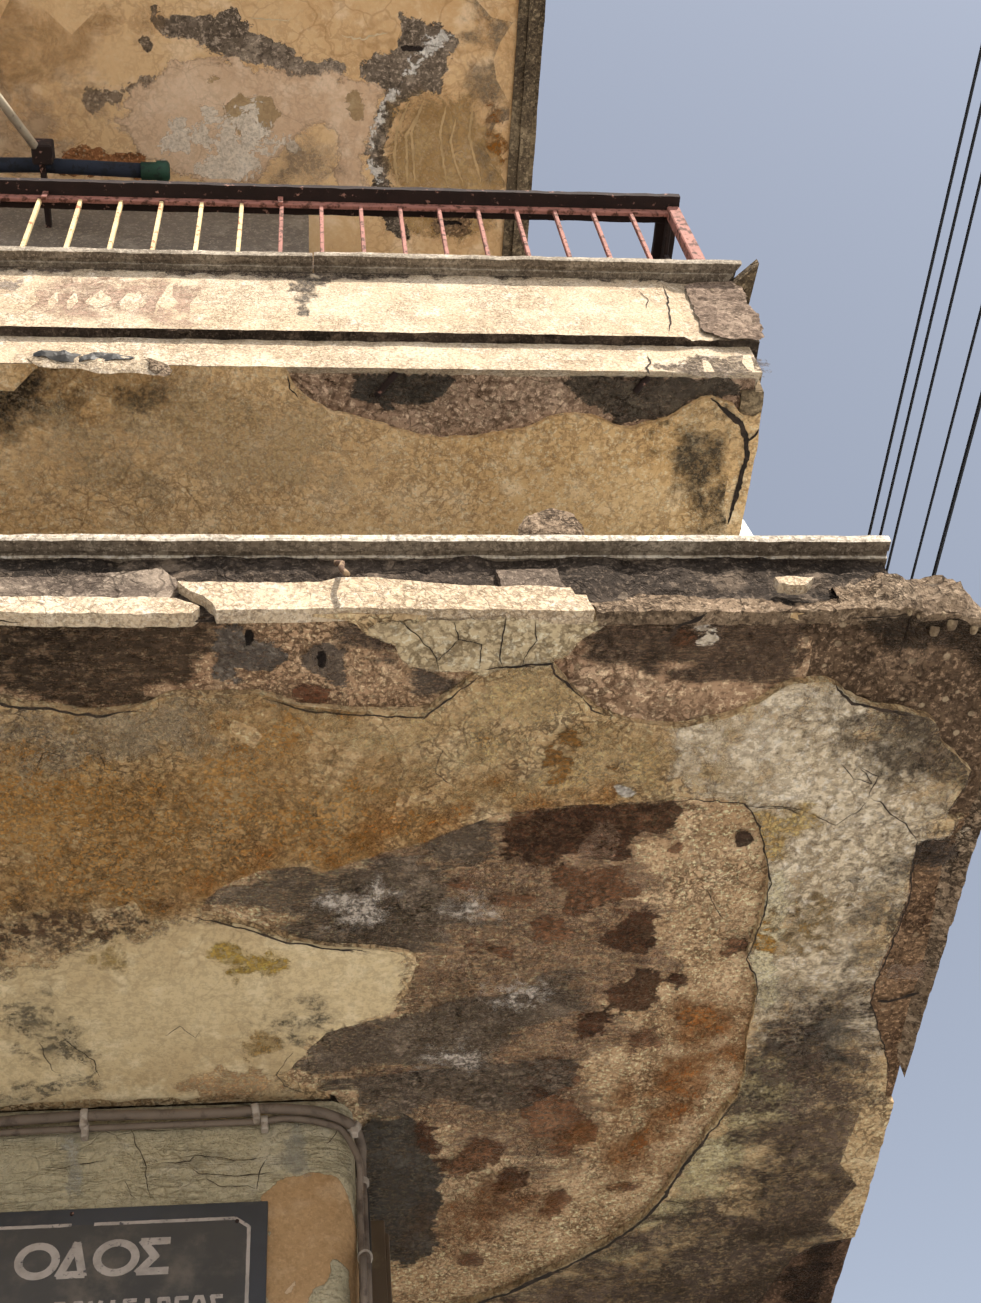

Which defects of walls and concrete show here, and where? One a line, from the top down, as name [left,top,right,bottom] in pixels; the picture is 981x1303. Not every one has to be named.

peeling [0,4,459,187]
damp [0,367,326,497]
flaking render [289,371,756,437]
crack [710,398,759,523]
flaking render [0,617,472,709]
damp [0,697,445,982]
flaking render [554,572,981,1097]
damp [1,1002,94,1100]
damp [176,998,329,1101]
flaking render [0,796,768,1303]
damp [452,682,972,1303]
crack [47,1130,274,1198]